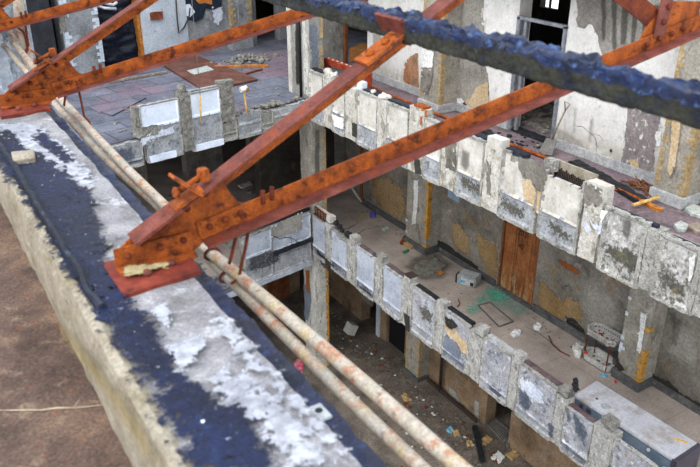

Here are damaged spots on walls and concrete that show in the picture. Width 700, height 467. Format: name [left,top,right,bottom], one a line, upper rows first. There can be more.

peeling [403,48,434,95]
peeling [621,109,681,178]
peeling [451,223,500,281]
leakage [500,197,524,219]
spalling [518,157,546,214]
leakage [545,216,572,241]
peeling [150,302,173,330]
peeling [537,282,583,322]
peeling [443,323,467,363]
peeling [163,311,352,467]